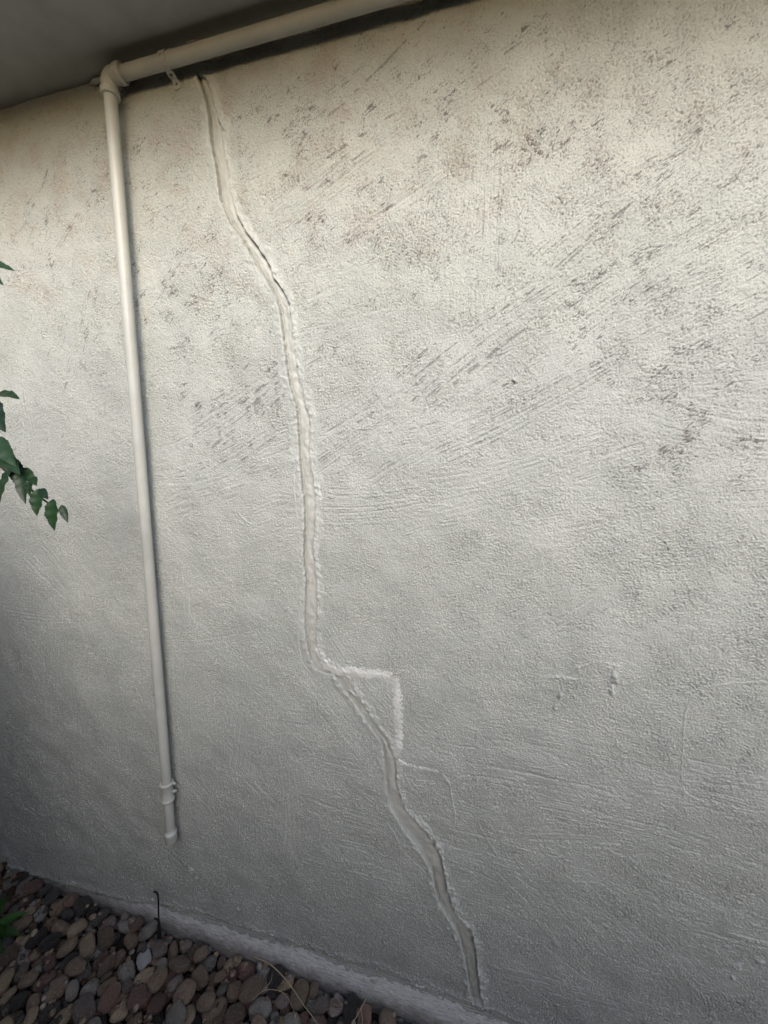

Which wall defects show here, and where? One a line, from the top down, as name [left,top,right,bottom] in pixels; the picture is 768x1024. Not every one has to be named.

crack [190,73,489,1006]